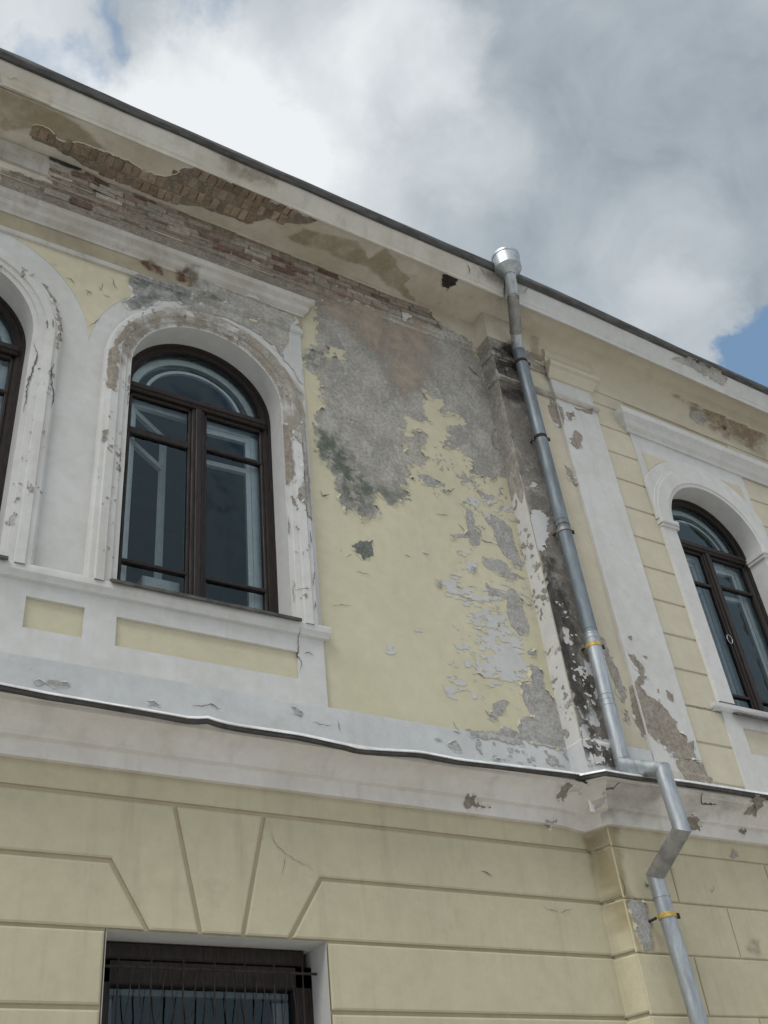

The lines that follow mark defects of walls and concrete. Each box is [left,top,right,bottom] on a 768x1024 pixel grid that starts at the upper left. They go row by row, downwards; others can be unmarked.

peeling [0,123,615,771]
leakage [492,343,543,476]
peeling [672,355,729,385]
leakage [541,531,615,766]
peeling [599,636,713,784]